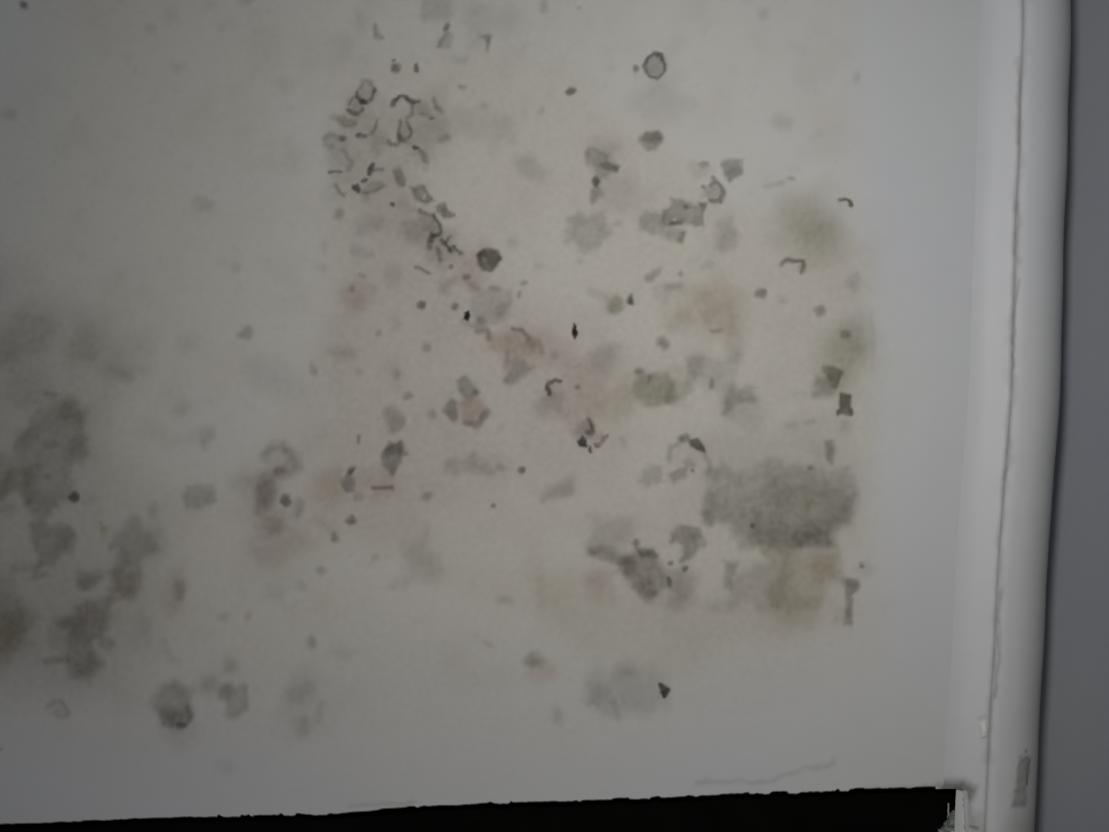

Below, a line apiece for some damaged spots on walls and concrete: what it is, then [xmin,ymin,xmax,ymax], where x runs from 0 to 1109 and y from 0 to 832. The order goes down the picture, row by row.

water stain [828,370,852,415]